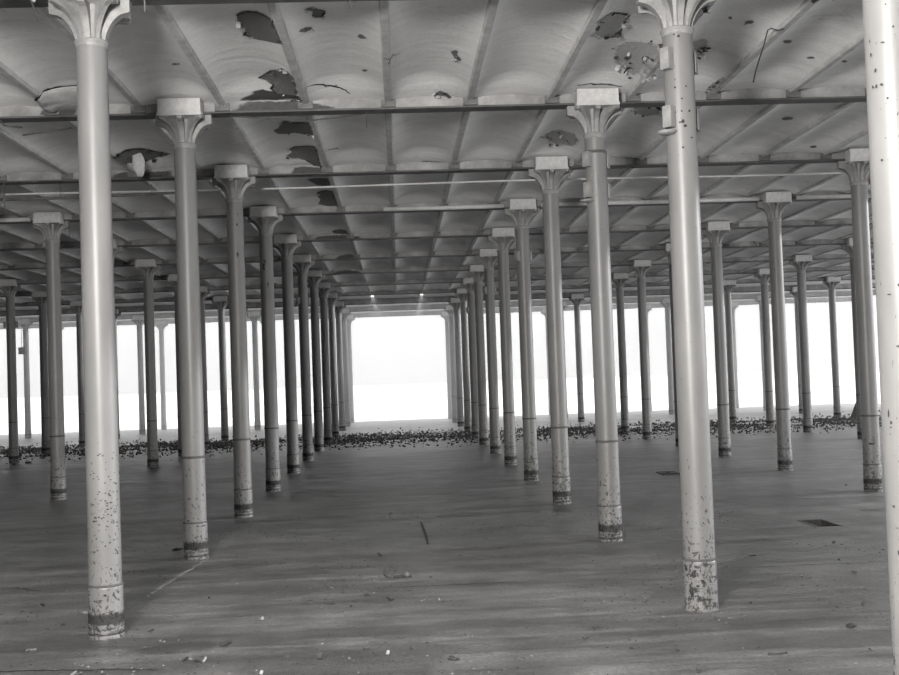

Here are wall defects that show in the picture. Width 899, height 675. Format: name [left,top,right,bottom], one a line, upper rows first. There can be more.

peeling [235,11,282,44]
peeling [299,7,326,32]
peeling [592,13,663,84]
peeling [258,68,297,96]
peeling [542,130,578,147]
flaking render [113,148,169,177]
peeling [274,121,338,207]